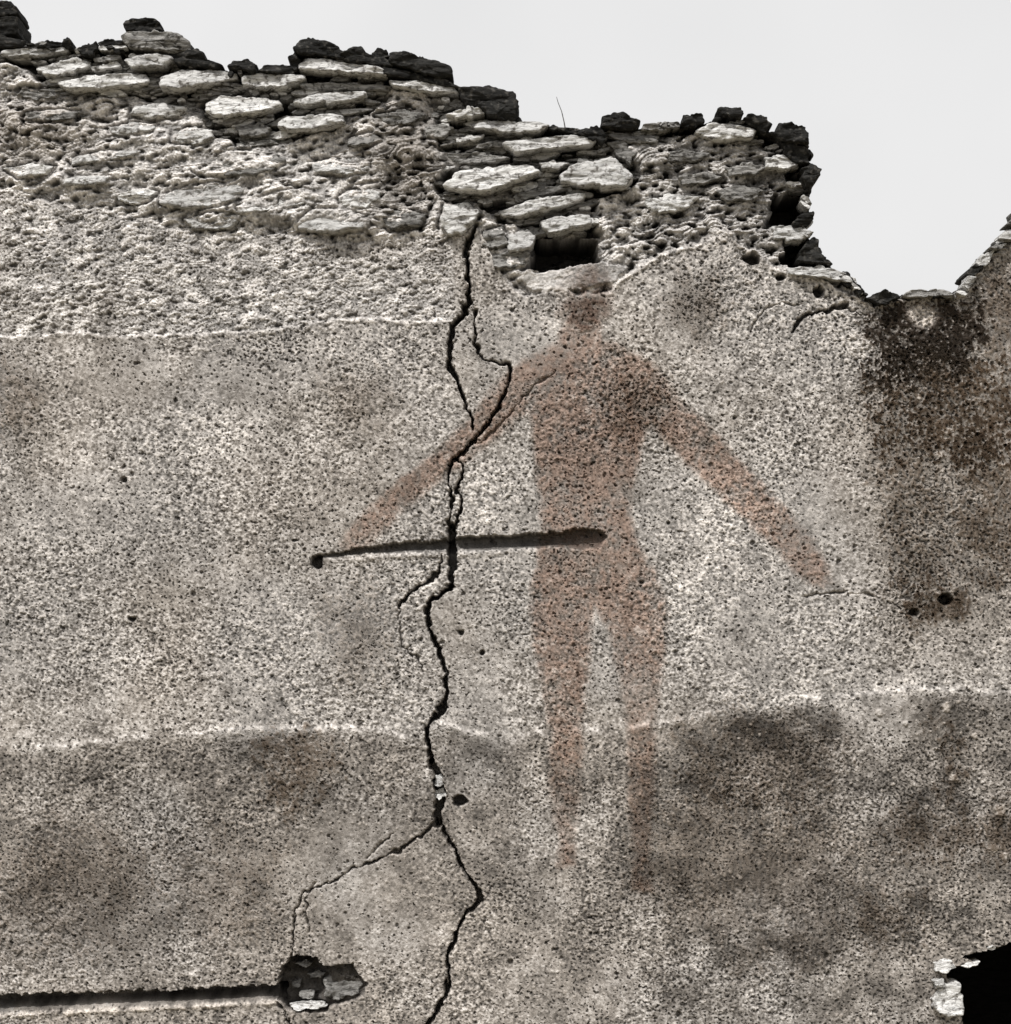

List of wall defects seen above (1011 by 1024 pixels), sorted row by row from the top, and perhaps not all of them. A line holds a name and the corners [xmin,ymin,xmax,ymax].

spalling [768,194,800,226]
spalling [778,244,802,268]
leakage [856,288,1011,476]
crack [289,222,557,1024]
spalling [276,954,369,1016]